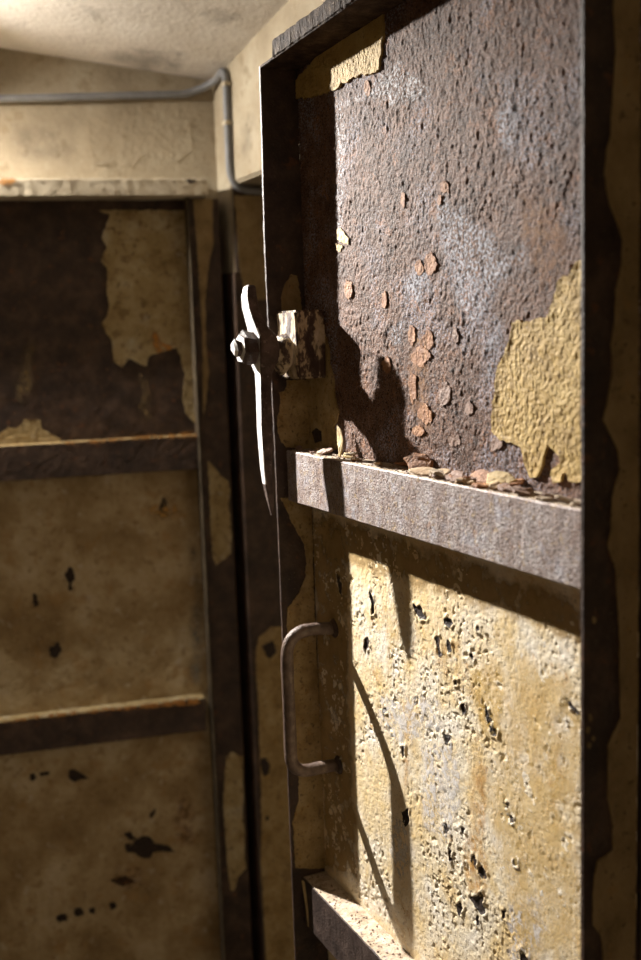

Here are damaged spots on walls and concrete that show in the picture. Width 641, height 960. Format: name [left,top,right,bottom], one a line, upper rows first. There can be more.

rust [415,252,438,276]
rust [344,279,353,300]
peeling [100,199,214,423]
rust [408,325,451,437]
peeling [0,419,60,445]
rust [490,436,503,451]
rust [403,452,435,476]
rust [470,469,490,483]
spalling [413,604,427,620]
spalling [435,617,453,657]
spalling [471,855,487,879]
spalling [457,892,486,925]